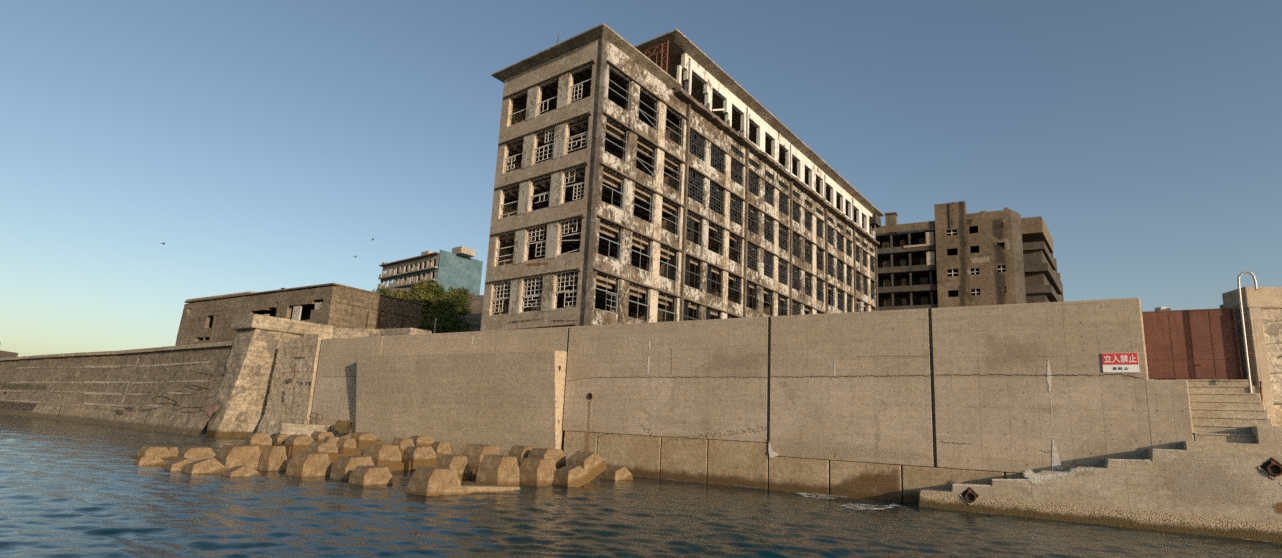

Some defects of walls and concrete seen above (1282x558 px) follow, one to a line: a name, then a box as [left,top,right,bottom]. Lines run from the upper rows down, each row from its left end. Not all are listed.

leakage [838,474,899,491]